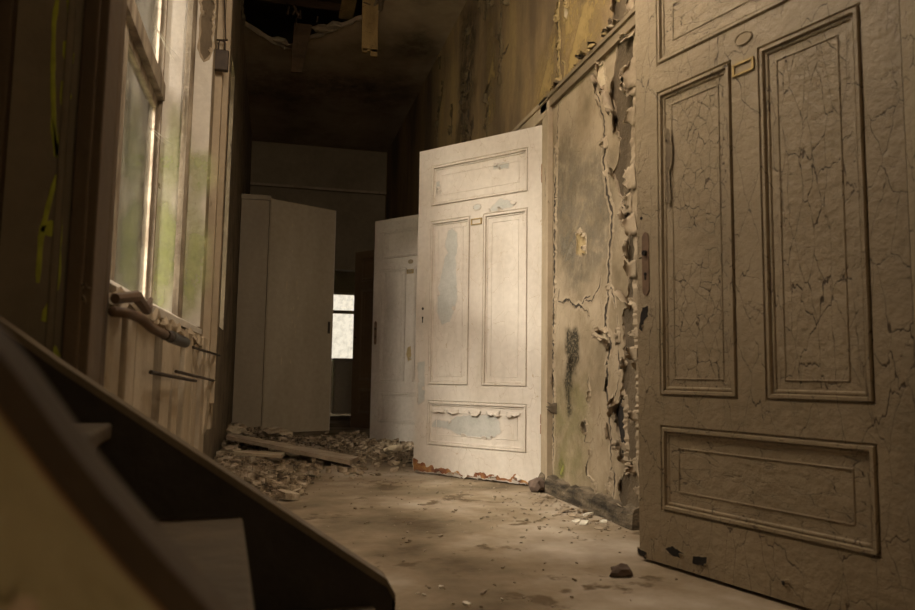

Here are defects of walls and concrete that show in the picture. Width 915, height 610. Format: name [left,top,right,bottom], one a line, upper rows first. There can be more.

damp [565,329,579,415]
crack [550,0,621,499]
peeling [574,0,649,508]